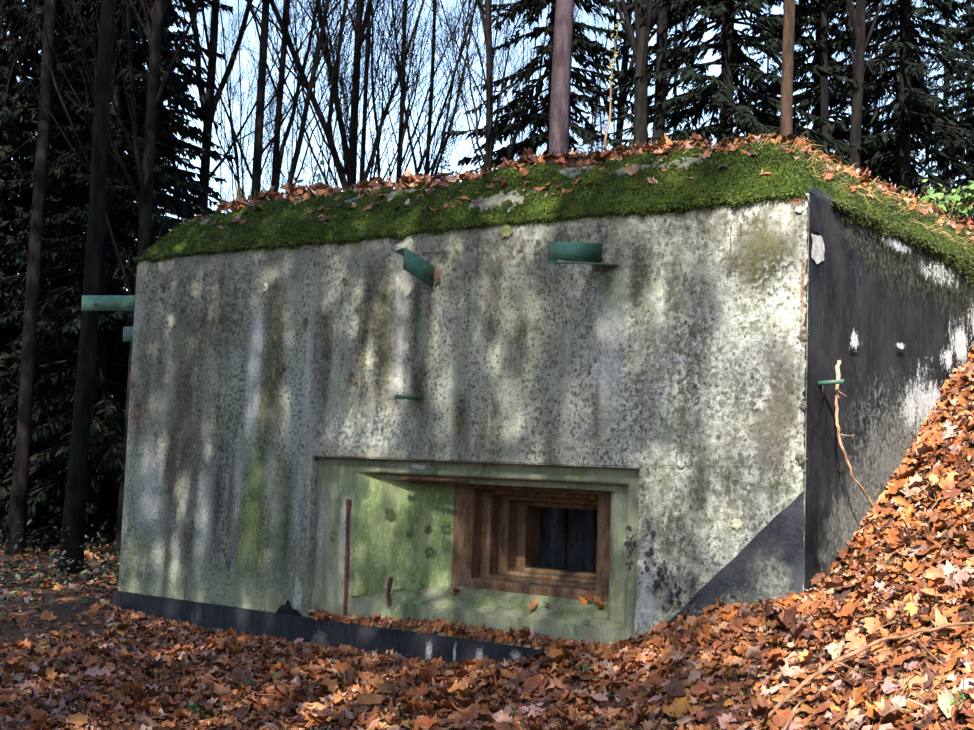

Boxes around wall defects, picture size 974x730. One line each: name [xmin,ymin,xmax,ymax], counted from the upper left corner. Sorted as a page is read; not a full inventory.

water stain [440,226,618,319]
water stain [674,211,795,302]
water stain [139,266,284,562]
water stain [331,411,401,445]
water stain [357,267,432,389]
water stain [455,398,466,434]
water stain [514,315,527,356]
water stain [642,262,796,489]